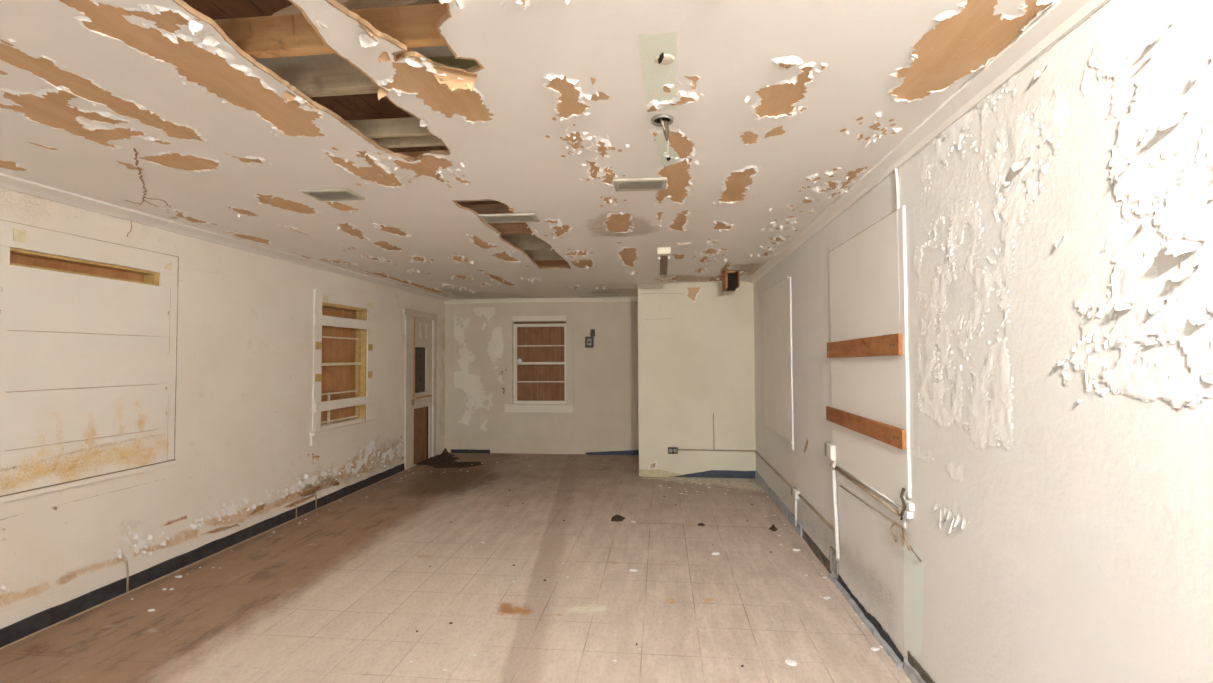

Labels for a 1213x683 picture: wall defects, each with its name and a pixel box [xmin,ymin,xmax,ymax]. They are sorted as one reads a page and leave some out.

peeling [0,39,272,174]
crack [2,148,320,270]
peeling [57,0,472,189]
peeling [164,193,540,432]
peeling [359,32,494,127]
peeling [542,74,868,302]
peeling [740,56,829,145]
peeling [886,0,1058,102]
peeling [913,75,1072,450]
peeling [1058,34,1213,412]
damp [0,396,172,511]
flaking render [0,437,401,609]